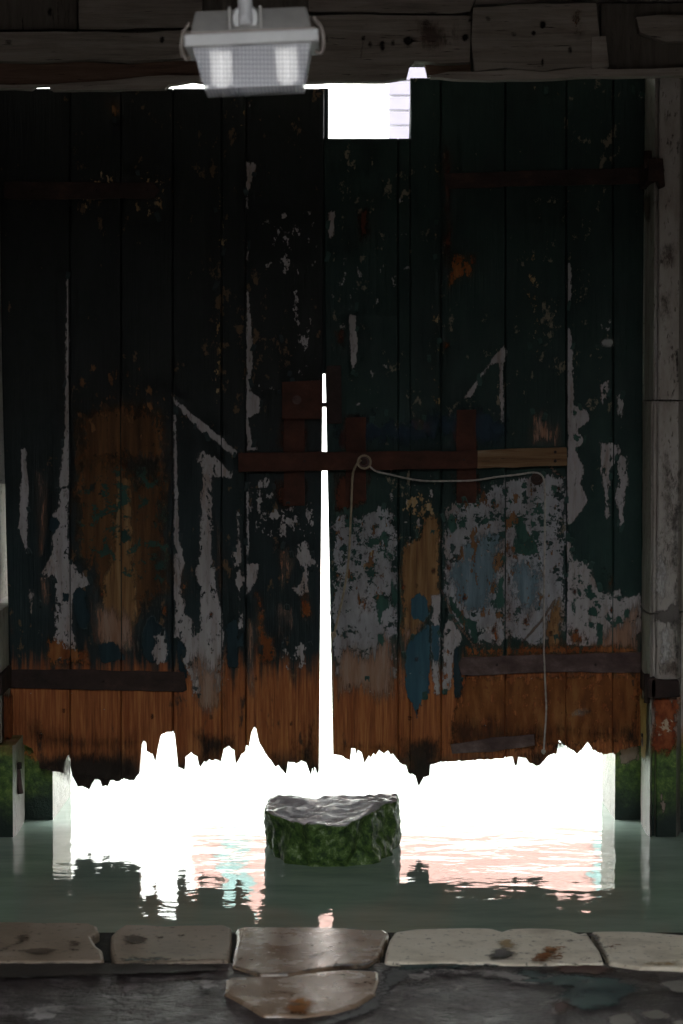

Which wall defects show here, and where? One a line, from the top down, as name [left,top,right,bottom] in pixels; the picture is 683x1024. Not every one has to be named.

corrosion [639,695,681,760]